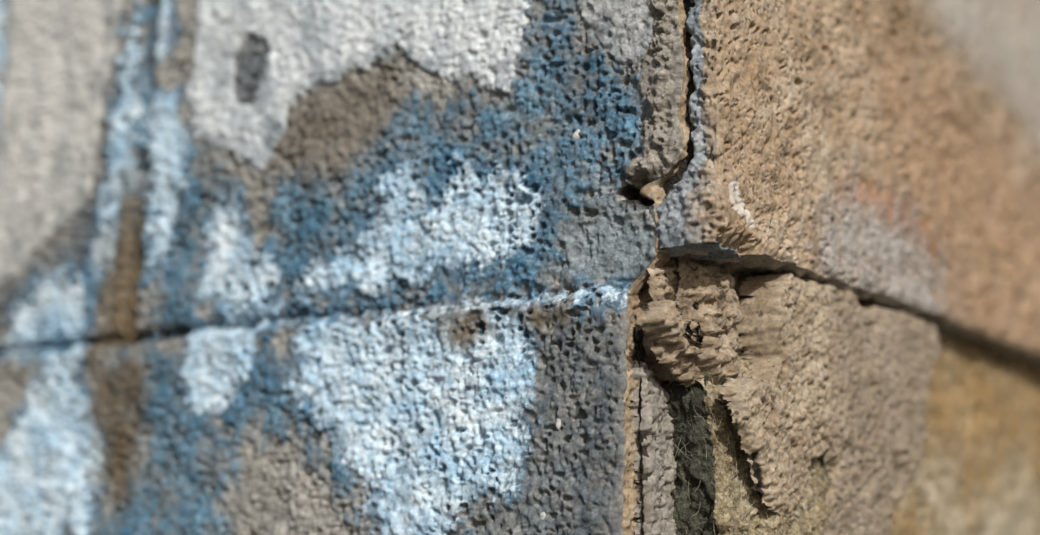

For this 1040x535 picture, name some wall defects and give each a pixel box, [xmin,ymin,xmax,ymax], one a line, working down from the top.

crack [617,0,695,273]
damp [42,345,90,389]
damp [100,0,644,535]
crack [633,327,649,535]
spalling [634,254,757,388]